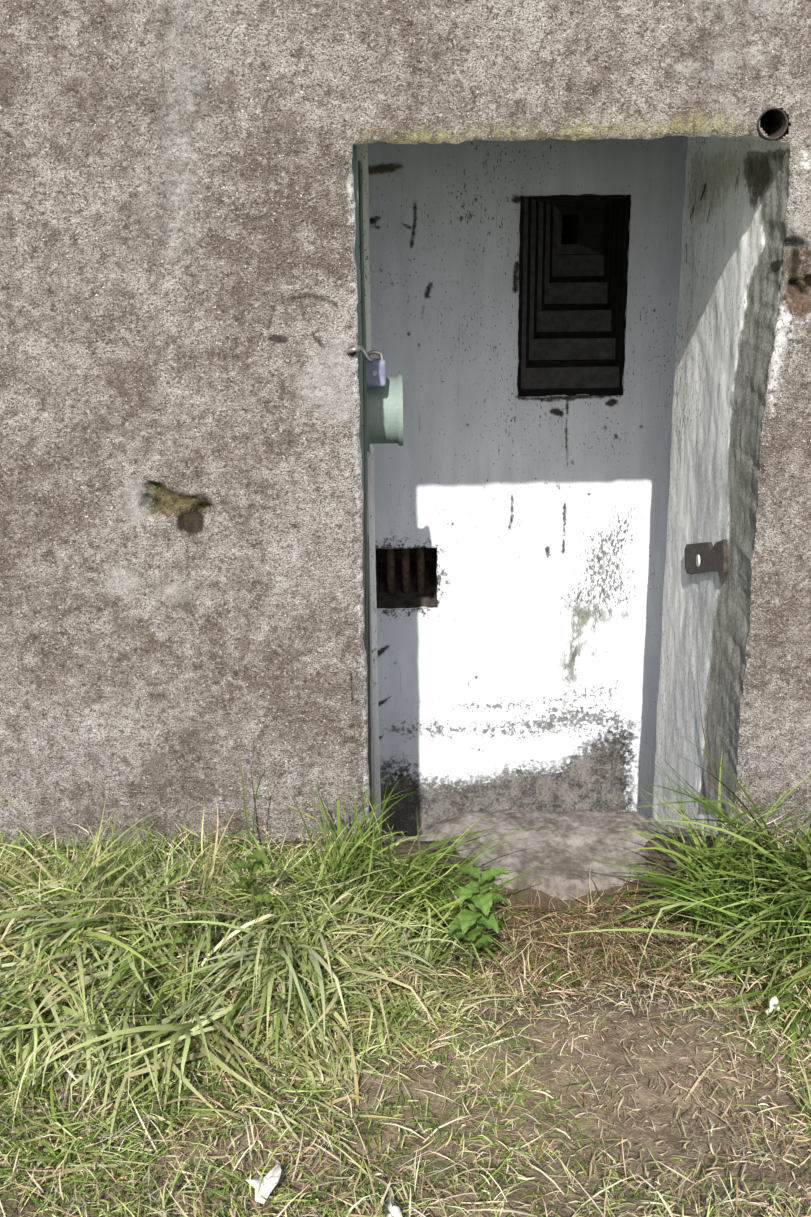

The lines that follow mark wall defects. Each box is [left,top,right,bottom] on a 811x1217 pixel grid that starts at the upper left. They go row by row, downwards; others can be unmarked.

spalling [142,482,211,534]
water stain [565,604,603,679]
water stain [380,724,636,836]